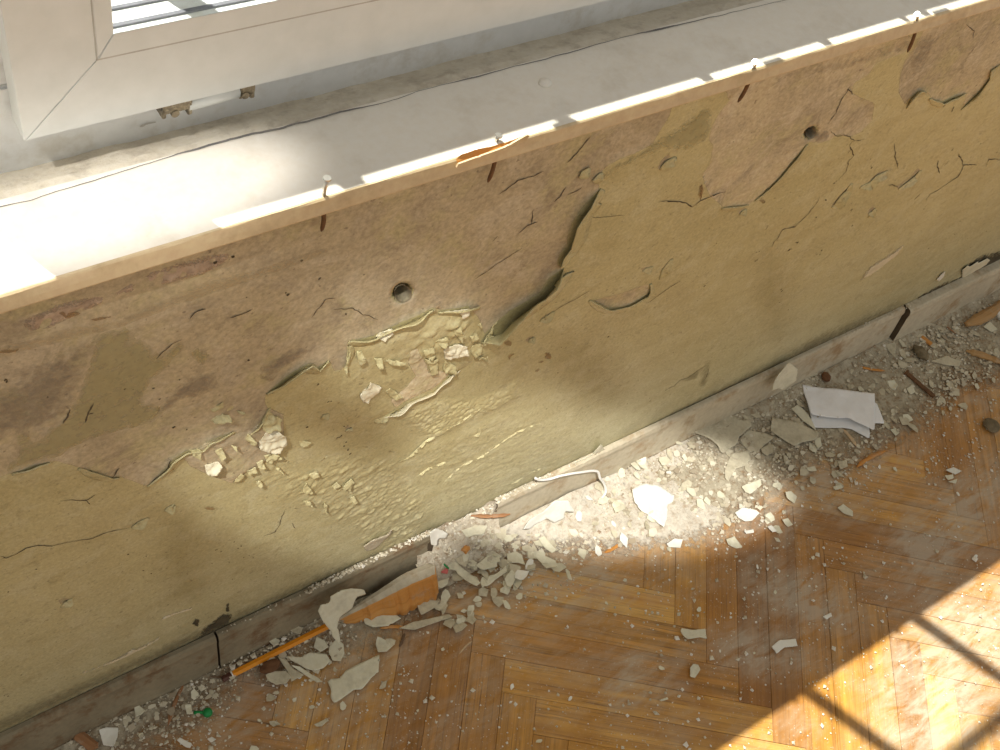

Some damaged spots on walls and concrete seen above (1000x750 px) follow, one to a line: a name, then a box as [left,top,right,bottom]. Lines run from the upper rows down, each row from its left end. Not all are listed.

crack [830,87,863,175]
peeling [702,7,1000,217]
crack [889,144,998,201]
peeling [0,108,673,489]
peeling [302,472,328,516]
peeling [332,479,358,505]